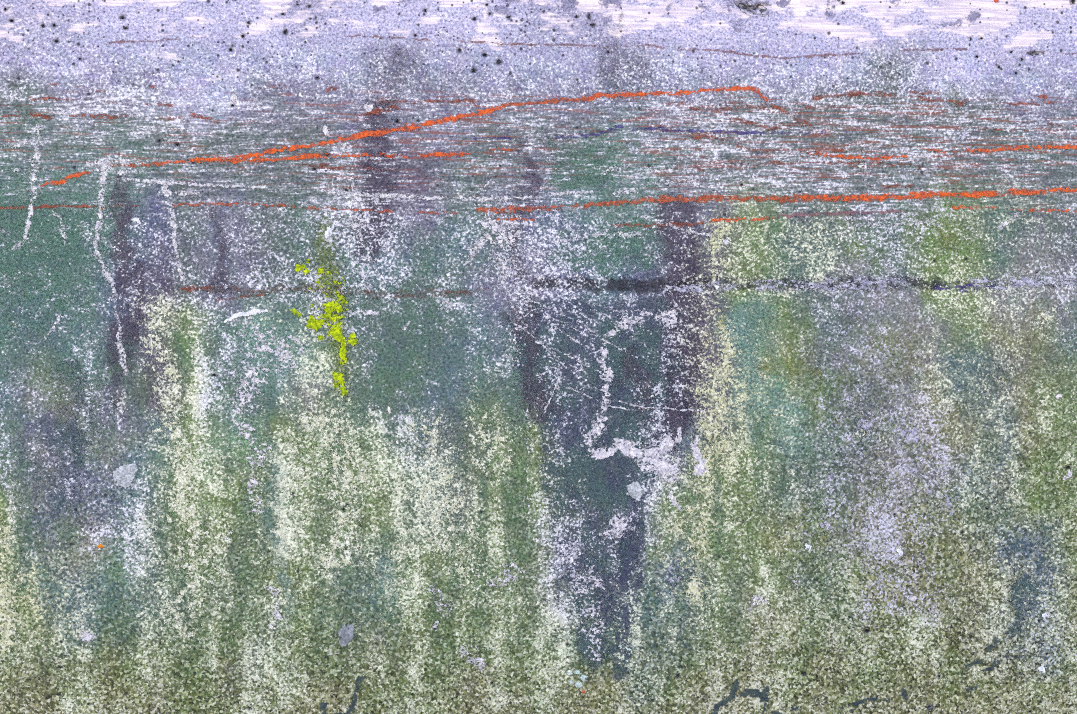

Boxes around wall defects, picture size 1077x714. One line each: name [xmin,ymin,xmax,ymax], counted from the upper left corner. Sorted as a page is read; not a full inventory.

rust [2,83,68,119]
rust [359,98,475,116]
rust [666,134,794,172]
rust [807,145,921,170]
leakage [808,144,1077,161]
leakage [0,85,827,383]
leakage [451,157,1077,680]